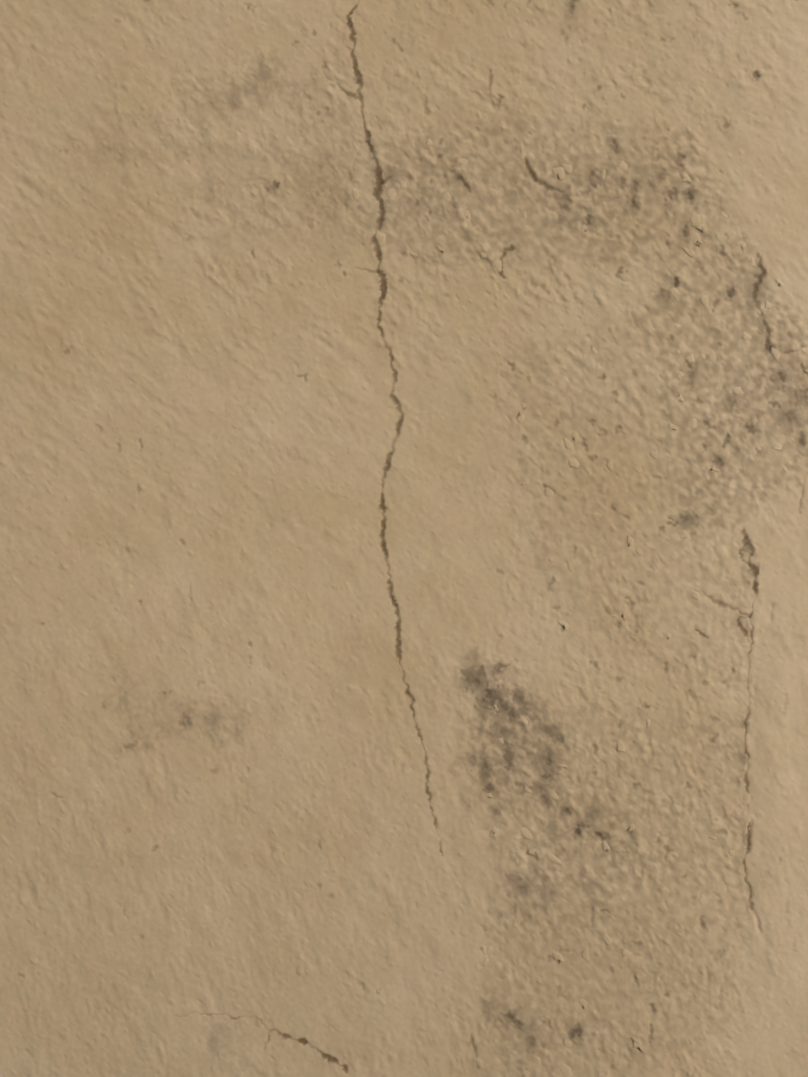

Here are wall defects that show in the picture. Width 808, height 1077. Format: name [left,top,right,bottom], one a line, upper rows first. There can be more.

crack [347,8,361,84]
crack [364,124,402,658]